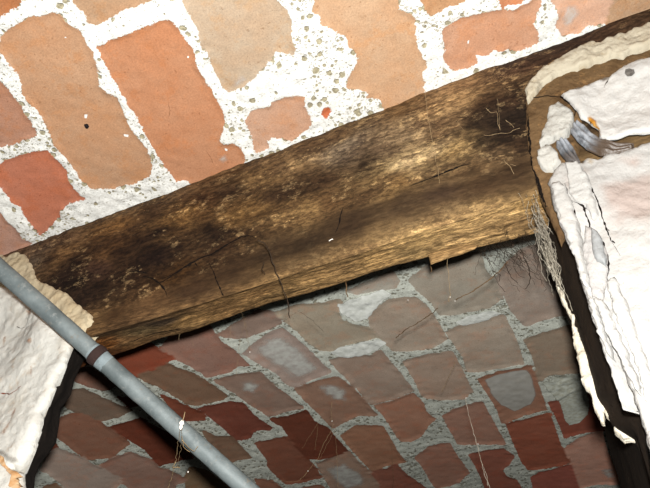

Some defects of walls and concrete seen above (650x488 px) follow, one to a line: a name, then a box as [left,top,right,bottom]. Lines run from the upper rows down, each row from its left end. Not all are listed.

crack [526,95,576,207]
crack [128,235,254,296]
crack [562,184,620,281]
water stain [260,339,316,375]